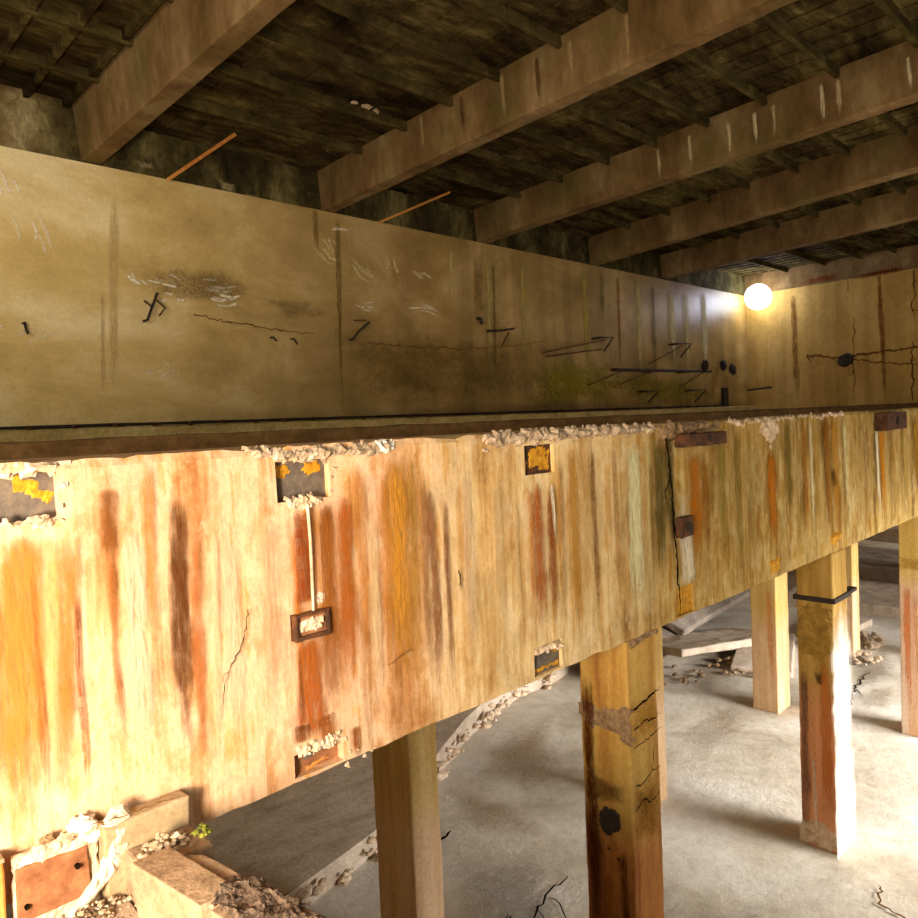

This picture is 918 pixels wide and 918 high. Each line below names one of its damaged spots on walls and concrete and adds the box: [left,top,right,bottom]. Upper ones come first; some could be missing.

crack [193,245,343,404]
crack [806,317,918,402]
crack [910,280,918,318]
spalling [0,460,71,530]
spalling [241,438,395,510]
rust [290,513,312,615]
rust [295,475,369,743]
rust [381,467,418,654]
rust [0,540,87,796]
rust [353,728,361,753]
crack [632,687,661,814]
crack [533,876,568,918]